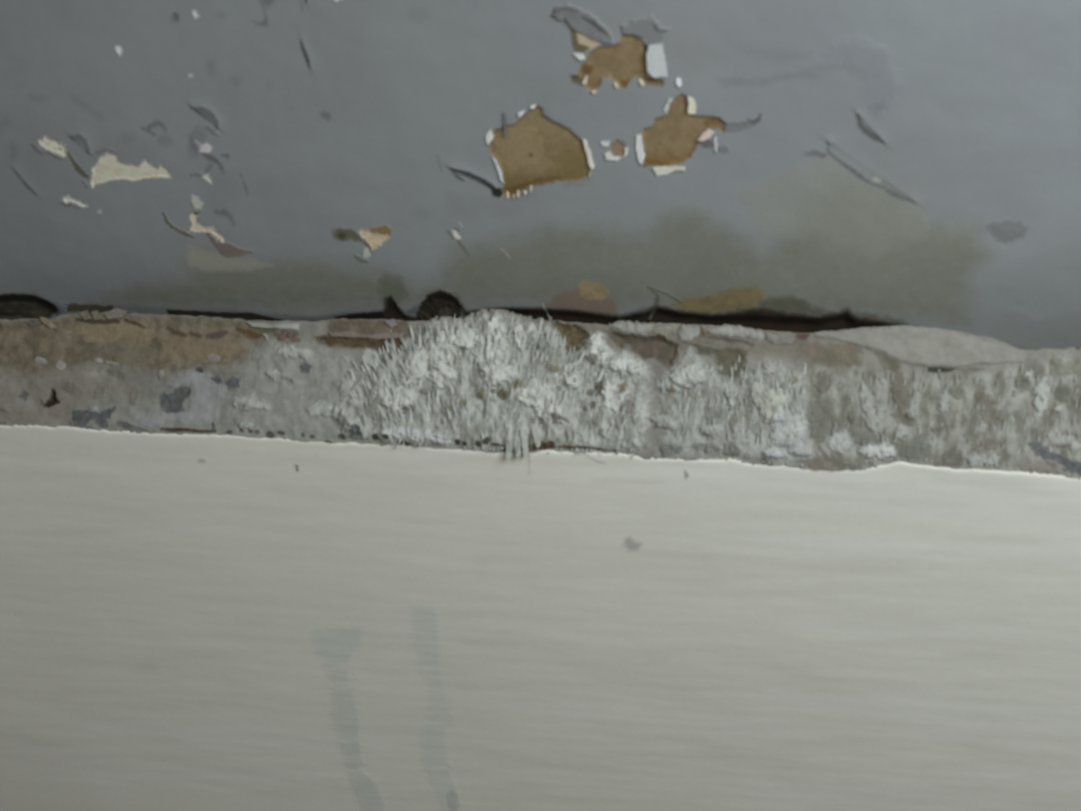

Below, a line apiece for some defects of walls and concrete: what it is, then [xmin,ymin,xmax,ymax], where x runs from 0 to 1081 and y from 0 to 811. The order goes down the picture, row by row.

peeling [486,2,764,199]
spalling [31,135,173,216]
spalling [330,224,394,264]
spalling [0,309,411,412]
spalling [549,320,589,350]
damp [73,144,1081,479]
peeling [603,320,868,369]
spalling [225,428,286,438]
spalling [454,436,506,452]
spalling [798,445,863,471]
damp [308,623,391,811]
damp [406,600,467,811]